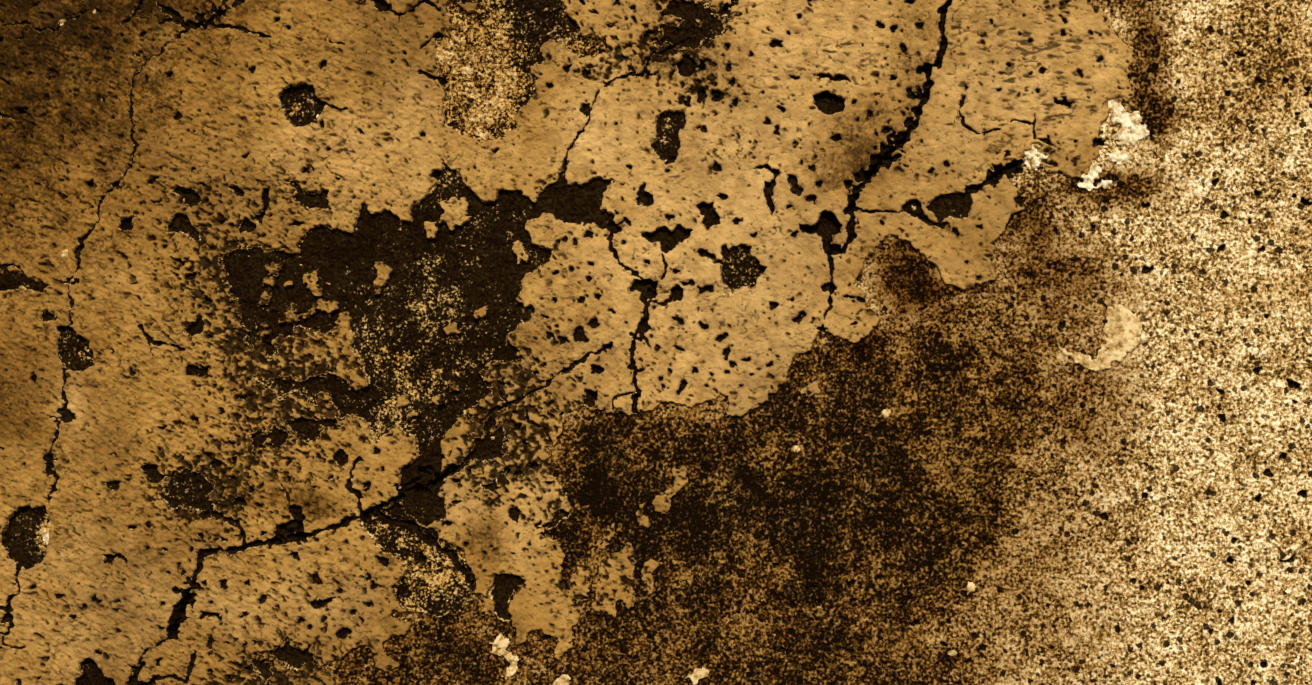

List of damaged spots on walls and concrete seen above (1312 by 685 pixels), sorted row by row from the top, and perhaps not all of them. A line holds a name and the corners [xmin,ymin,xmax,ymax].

crack [57,0,272,330]
flaking render [434,0,617,154]
flaking render [644,0,739,173]
spalling [751,164,842,256]
crack [816,0,1061,333]
spalling [900,191,991,236]
crack [42,368,76,503]
flaking render [221,162,773,640]
crack [478,218,673,443]
leakage [327,0,1175,685]
flaking render [140,441,318,685]
crack [137,456,475,684]